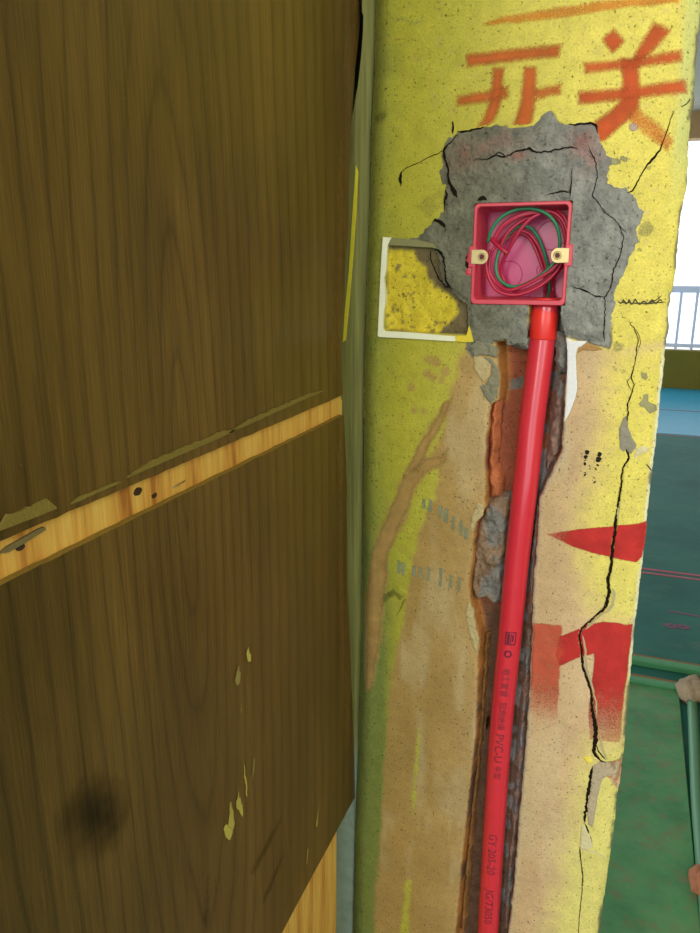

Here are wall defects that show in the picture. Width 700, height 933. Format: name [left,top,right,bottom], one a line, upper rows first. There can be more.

crack [627,98,691,193]
crack [398,122,487,290]
crack [474,122,626,341]
peeling [470,341,499,403]
crack [626,321,641,425]
peeling [470,503,484,531]
peeling [466,601,479,654]
crack [578,449,652,933]